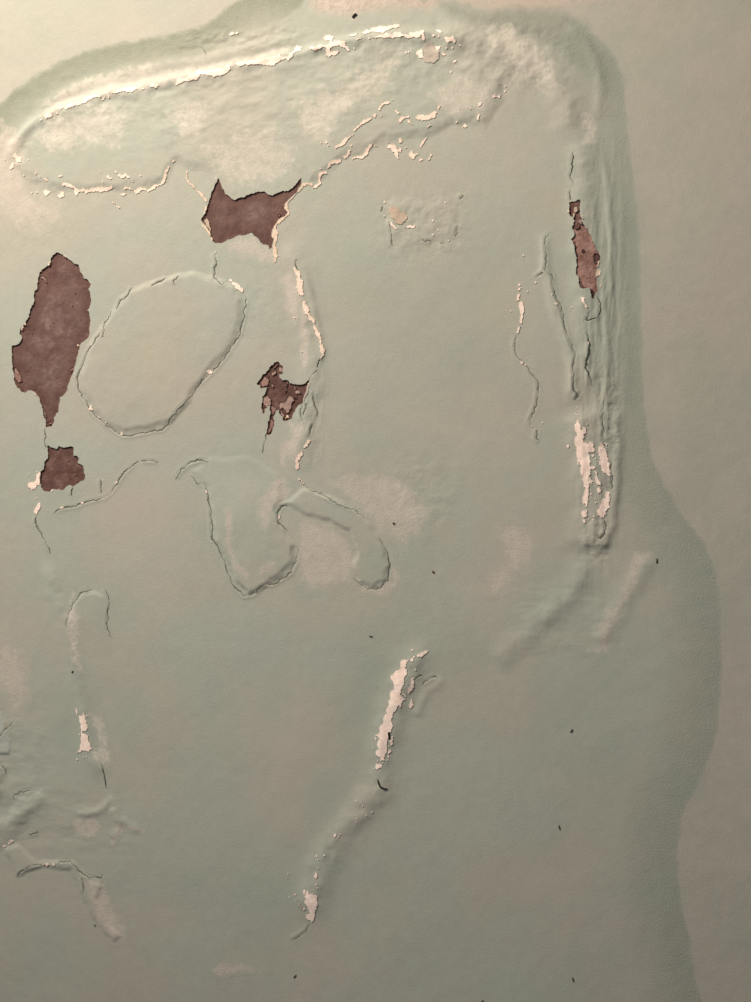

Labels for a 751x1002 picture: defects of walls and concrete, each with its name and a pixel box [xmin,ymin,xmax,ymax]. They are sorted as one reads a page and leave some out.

peeling [12,253,91,427]
damp [221,234,311,374]
peeling [257,361,310,435]
peeling [186,100,440,263]
damp [0,0,639,240]
crack [514,336,543,439]
peeling [567,200,601,298]
peeling [27,445,85,500]
damp [220,412,438,601]
damp [536,14,726,1002]
damp [61,588,85,676]
spalling [373,649,428,769]